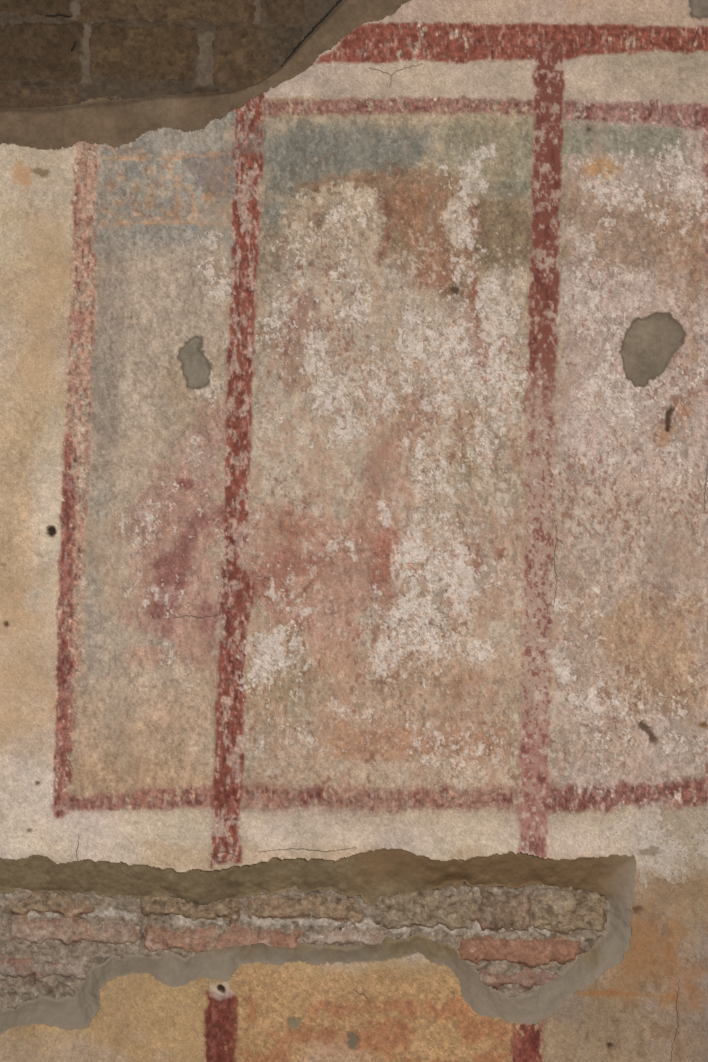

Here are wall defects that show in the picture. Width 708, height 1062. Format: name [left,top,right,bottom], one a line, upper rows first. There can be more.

flaking render [0,0,411,150]
peeling [558,136,708,512]
peeling [180,139,549,790]
flaking render [0,843,662,1035]
spalling [346,1030,361,1051]